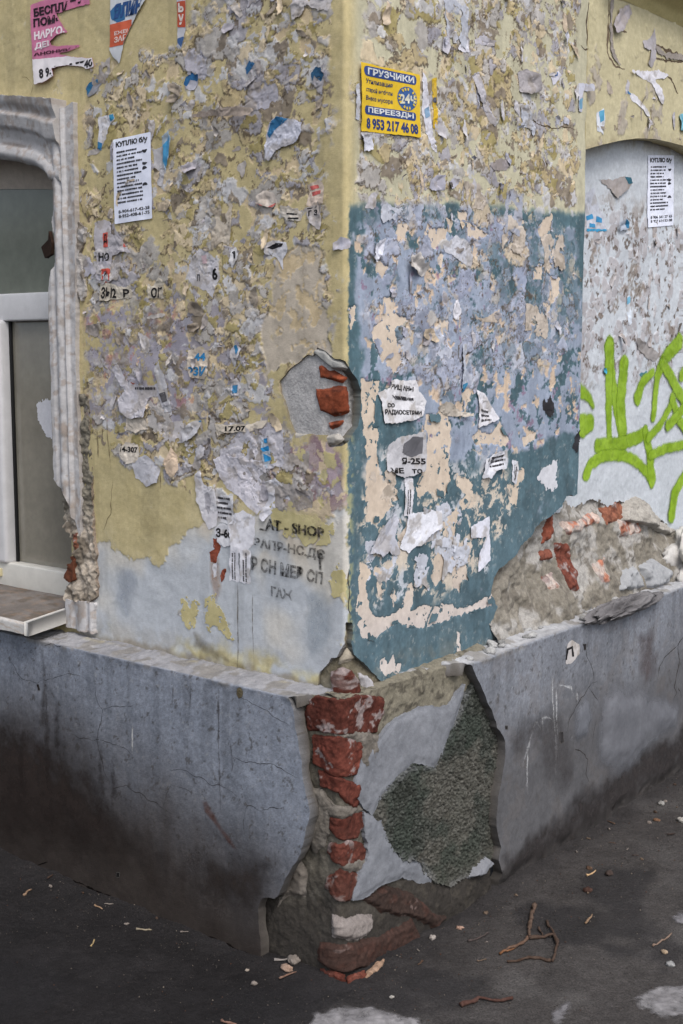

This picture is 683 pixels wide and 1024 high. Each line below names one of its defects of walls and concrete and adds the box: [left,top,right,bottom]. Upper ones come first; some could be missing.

peeling [372,297,407,374]
peeling [424,211,488,284]
peeling [538,213,553,237]
peeling [532,264,560,316]
spalling [60,393,100,603]
spalling [281,348,400,523]
peeling [416,413,476,592]
peeling [472,421,509,447]
peeling [507,468,524,508]
water stain [0,726,113,846]
crack [11,662,293,828]
spalling [265,496,680,975]